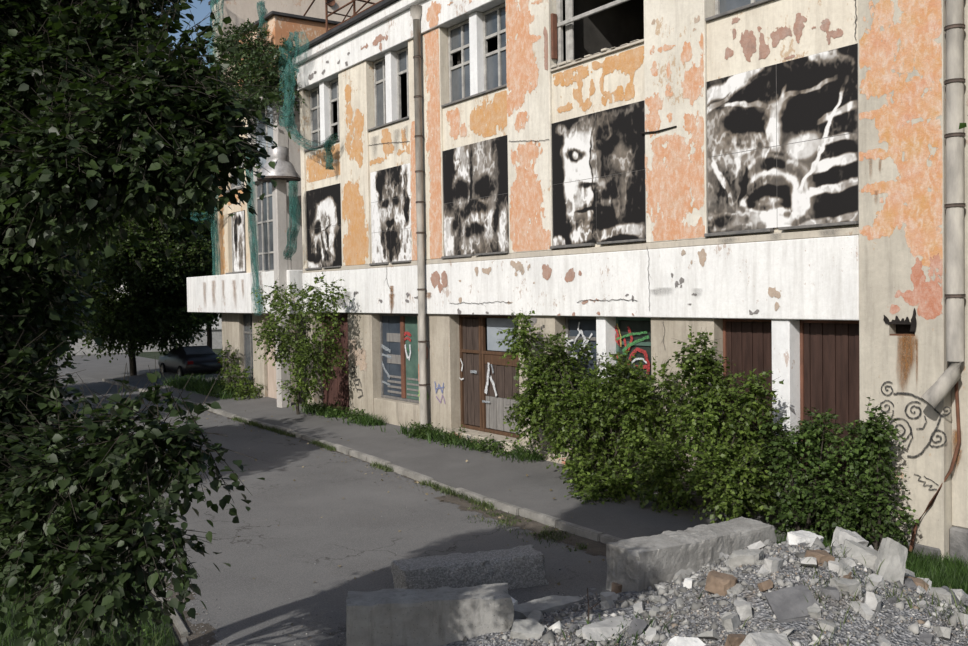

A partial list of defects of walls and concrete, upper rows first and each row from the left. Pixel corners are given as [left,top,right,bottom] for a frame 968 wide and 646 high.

peeling [725,13,843,62]
peeling [306,0,707,276]
peeling [859,0,943,320]
peeling [430,271,461,293]
spalling [533,264,552,284]
spalling [565,268,582,282]
rust [898,335,918,386]